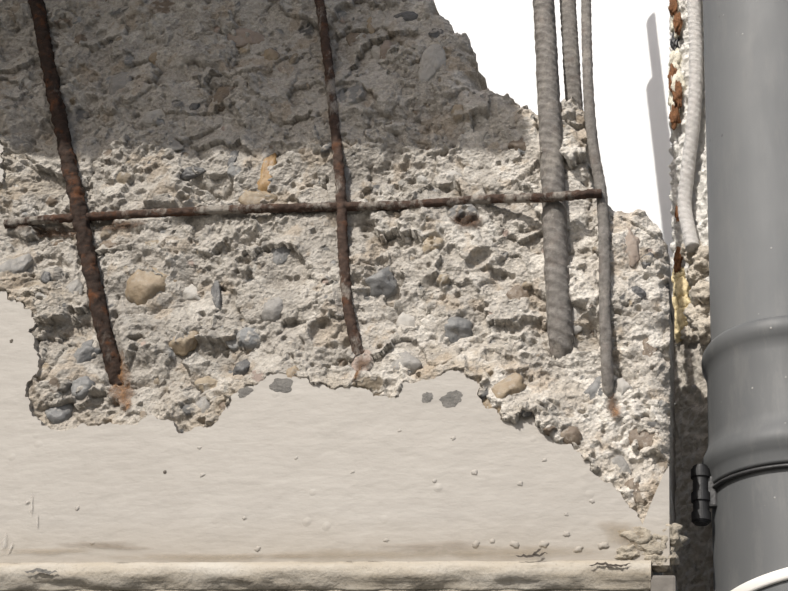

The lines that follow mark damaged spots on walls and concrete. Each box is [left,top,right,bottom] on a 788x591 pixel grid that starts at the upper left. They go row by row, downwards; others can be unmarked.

rust [668,0,683,36]
rust [667,63,683,130]
rust [21,225,76,238]
spalling [0,0,677,524]
flaking render [615,523,690,581]